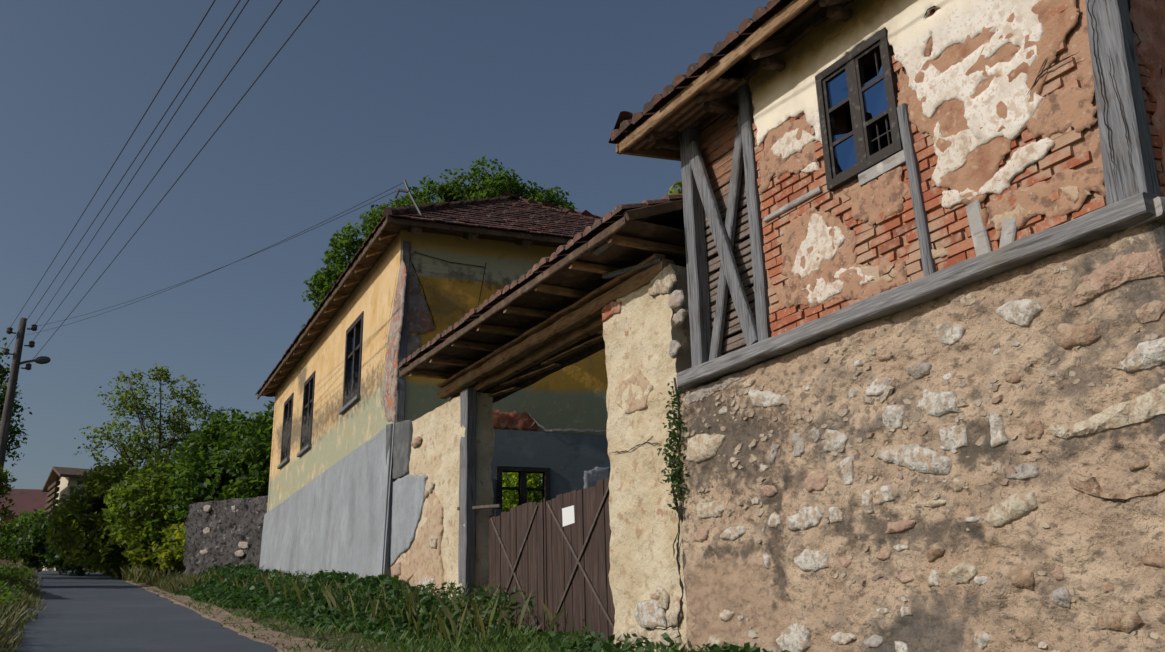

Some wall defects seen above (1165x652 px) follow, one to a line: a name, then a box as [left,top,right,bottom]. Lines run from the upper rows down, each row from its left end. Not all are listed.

flaking render [383,260,435,422]
flaking render [399,488,445,598]
crack [608,437,685,648]